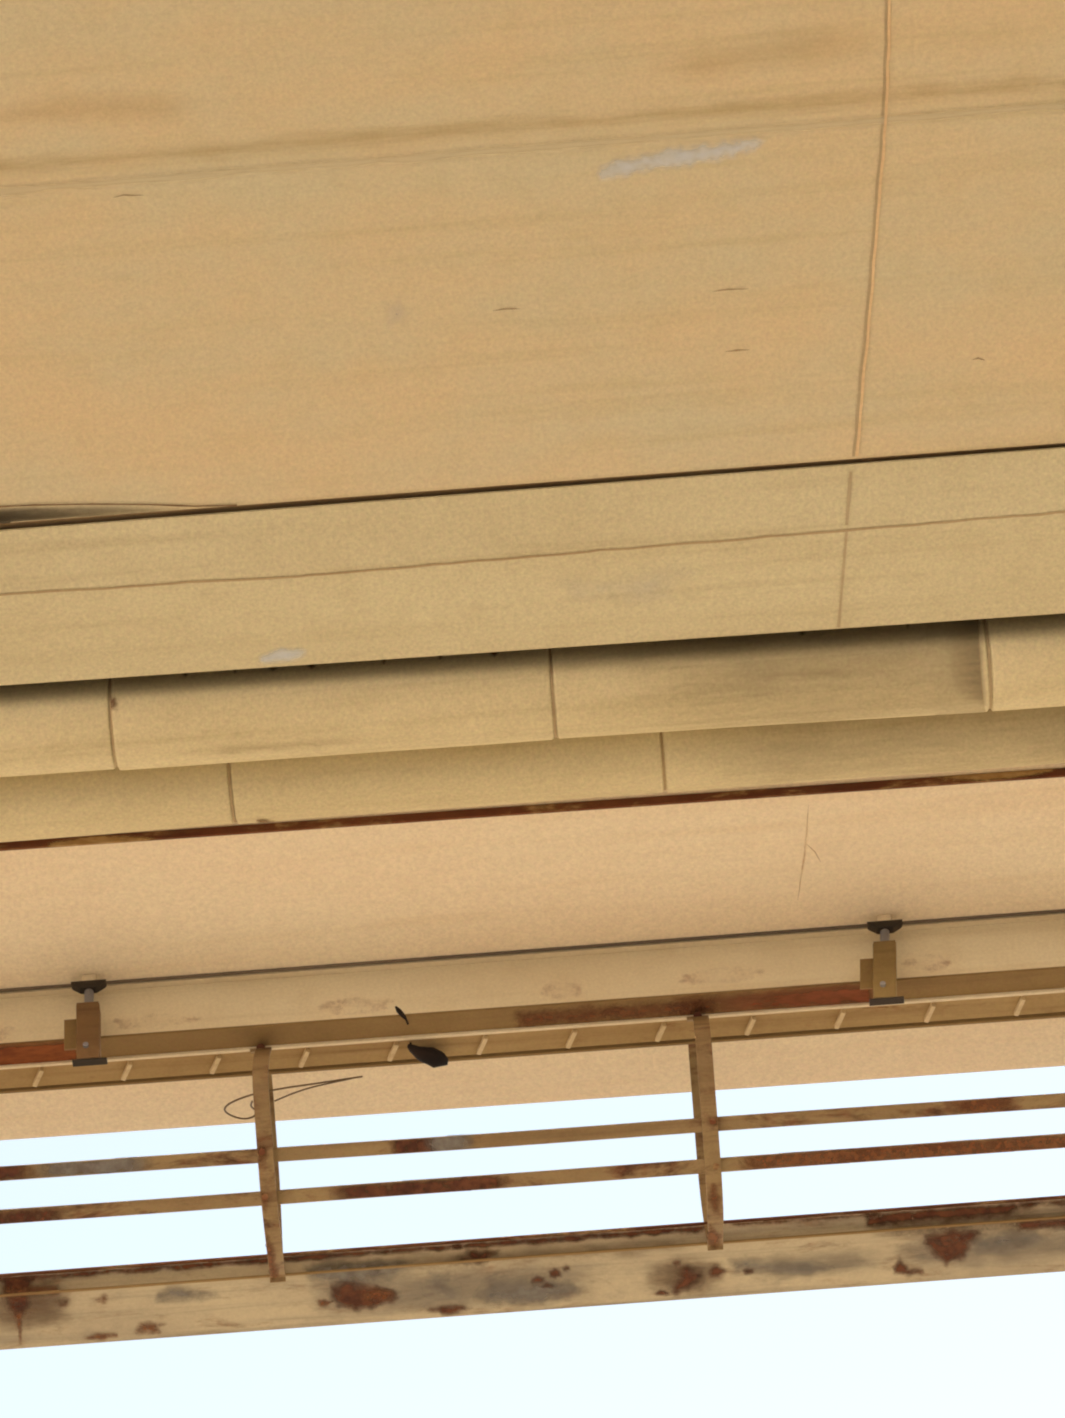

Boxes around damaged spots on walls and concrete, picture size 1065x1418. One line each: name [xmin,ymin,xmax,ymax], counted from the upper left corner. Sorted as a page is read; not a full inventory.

peeling [604,143,756,175]
leakage [0,503,237,524]
crack [797,805,821,900]
corrosion [734,1199,1065,1264]
corrosion [0,1226,724,1340]
corrosion [894,1261,922,1275]